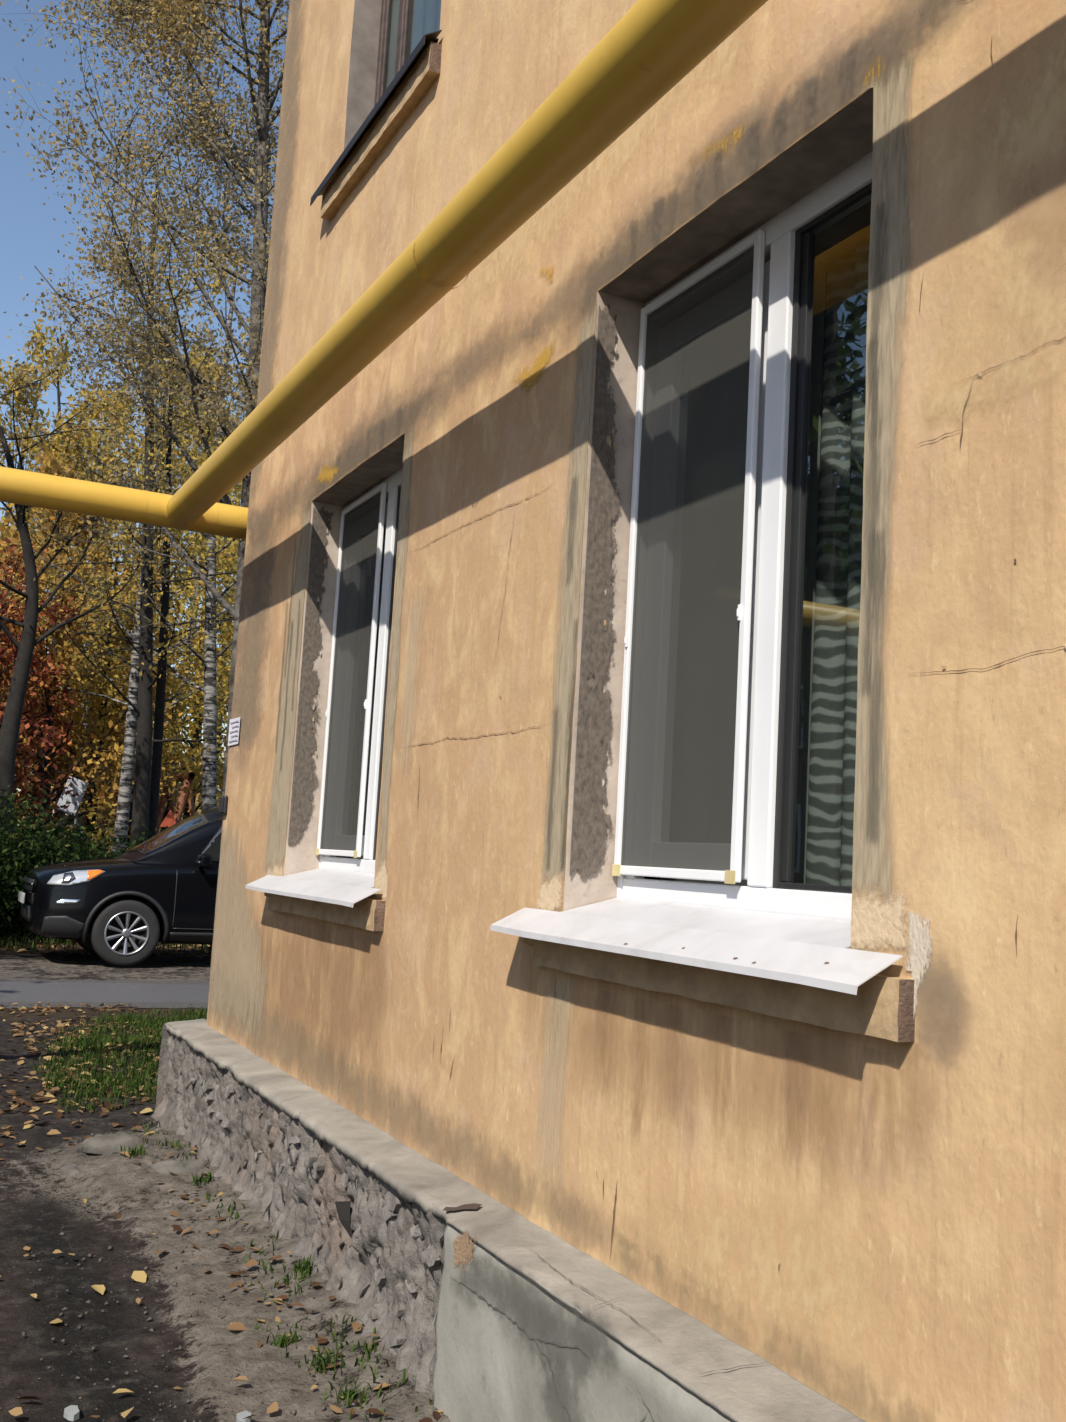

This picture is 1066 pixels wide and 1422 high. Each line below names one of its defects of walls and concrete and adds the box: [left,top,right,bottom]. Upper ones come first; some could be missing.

damp [525,0,960,900]
crack [916,337,1066,446]
peeling [288,507,333,846]
crack [394,724,544,749]
crack [412,485,550,662]
peeling [569,304,621,878]
crack [910,644,1066,674]
damp [920,970,959,1037]
crack [439,1235,588,1422]
crack [529,1248,667,1346]